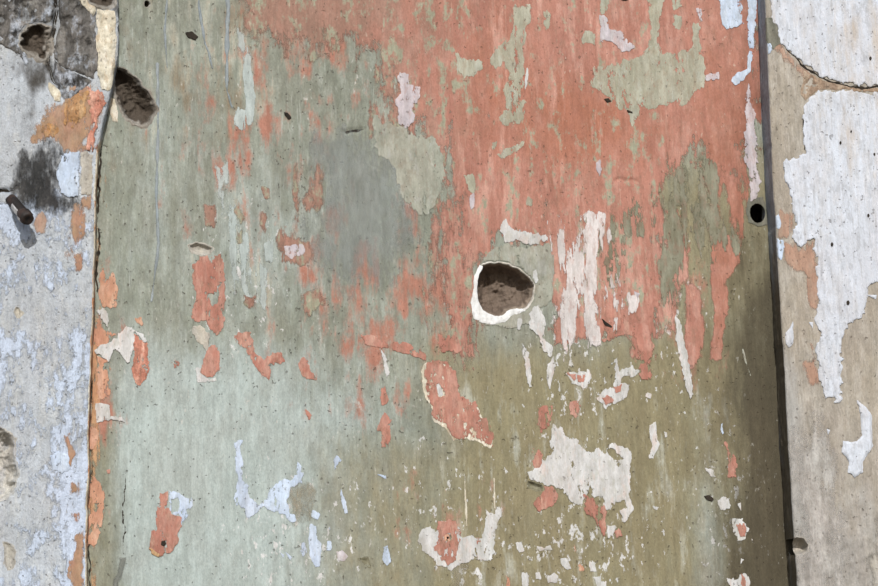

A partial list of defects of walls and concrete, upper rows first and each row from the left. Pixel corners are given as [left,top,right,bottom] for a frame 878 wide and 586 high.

spalling [0,0,118,122]
crack [783,45,878,150]
corrosion [68,195,92,271]
peeling [88,217,150,450]
peeling [188,162,314,383]
peeling [234,0,878,449]
corrosion [64,433,76,466]
corrosion [67,533,96,586]
corrosion [71,343,101,529]
peeling [418,478,502,571]
peeling [526,405,634,538]
peeling [841,400,873,478]